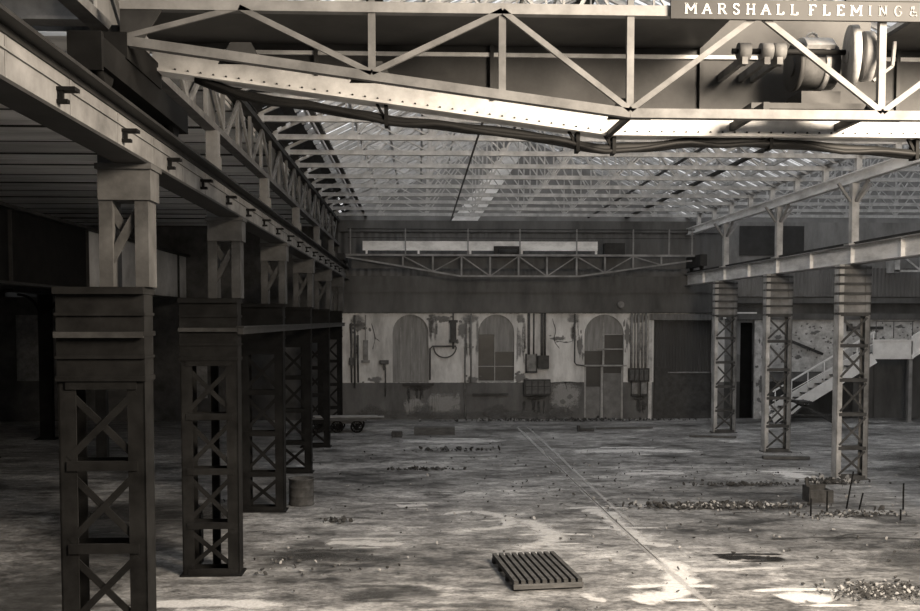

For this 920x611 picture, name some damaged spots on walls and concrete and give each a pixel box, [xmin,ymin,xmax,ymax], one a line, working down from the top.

damp [360,394,570,419]